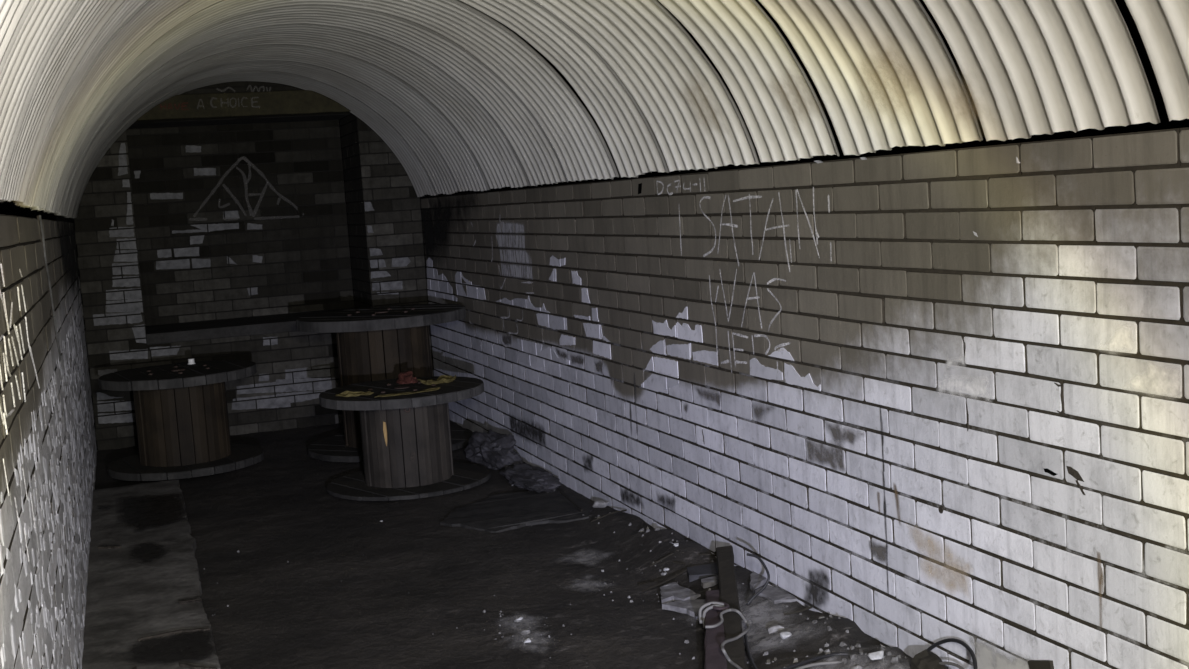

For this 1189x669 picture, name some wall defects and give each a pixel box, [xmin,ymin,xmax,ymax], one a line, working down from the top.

peeling [185,145,201,153]
peeling [194,168,216,176]
peeling [156,211,262,270]
peeling [369,248,411,295]
peeling [426,256,611,374]
peeling [0,143,179,669]
peeling [232,366,332,410]
peeling [641,307,718,392]
peeling [698,389,720,405]
peeling [750,348,821,391]